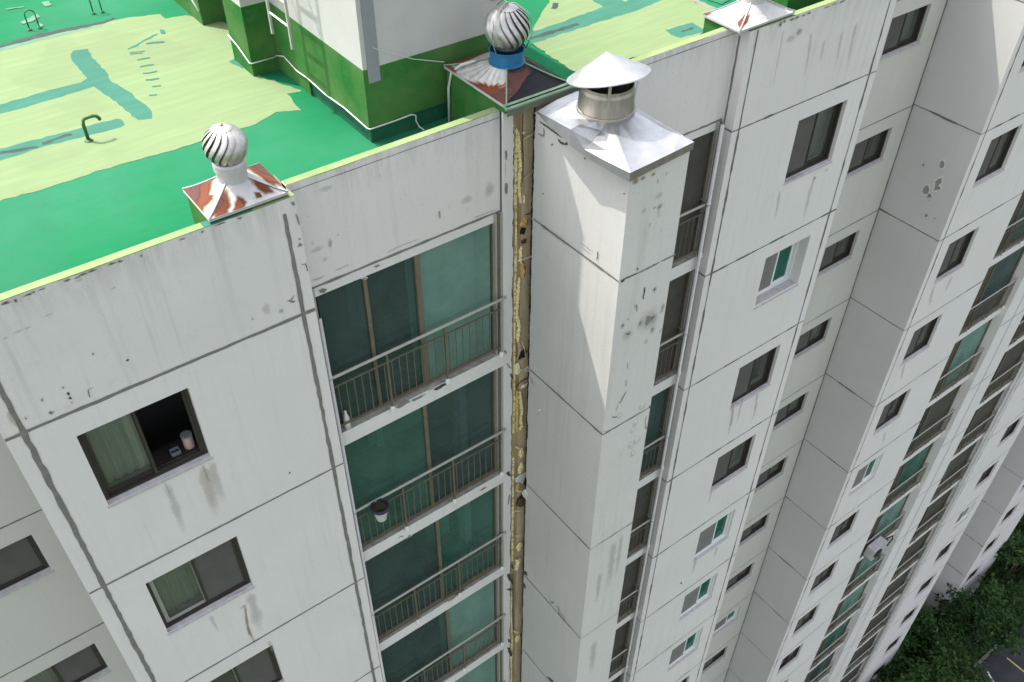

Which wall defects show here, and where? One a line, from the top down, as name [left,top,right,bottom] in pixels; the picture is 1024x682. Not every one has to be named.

rust [444,51,537,105]
rust [183,163,284,218]
peeling [922,159,945,219]
peeling [506,471,528,507]